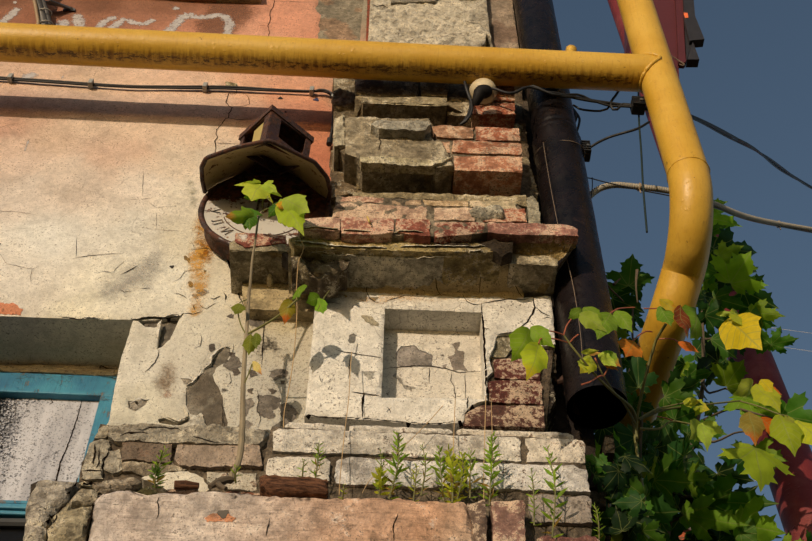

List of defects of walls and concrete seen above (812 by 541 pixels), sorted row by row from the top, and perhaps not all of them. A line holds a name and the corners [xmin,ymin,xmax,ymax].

peeling [315,0,364,41]
crack [214,84,250,152]
peeling [0,302,23,315]
peeling [128,397,149,411]
spalling [131,313,183,348]
spalling [159,344,299,428]
crack [306,277,549,428]
peeling [393,342,468,389]